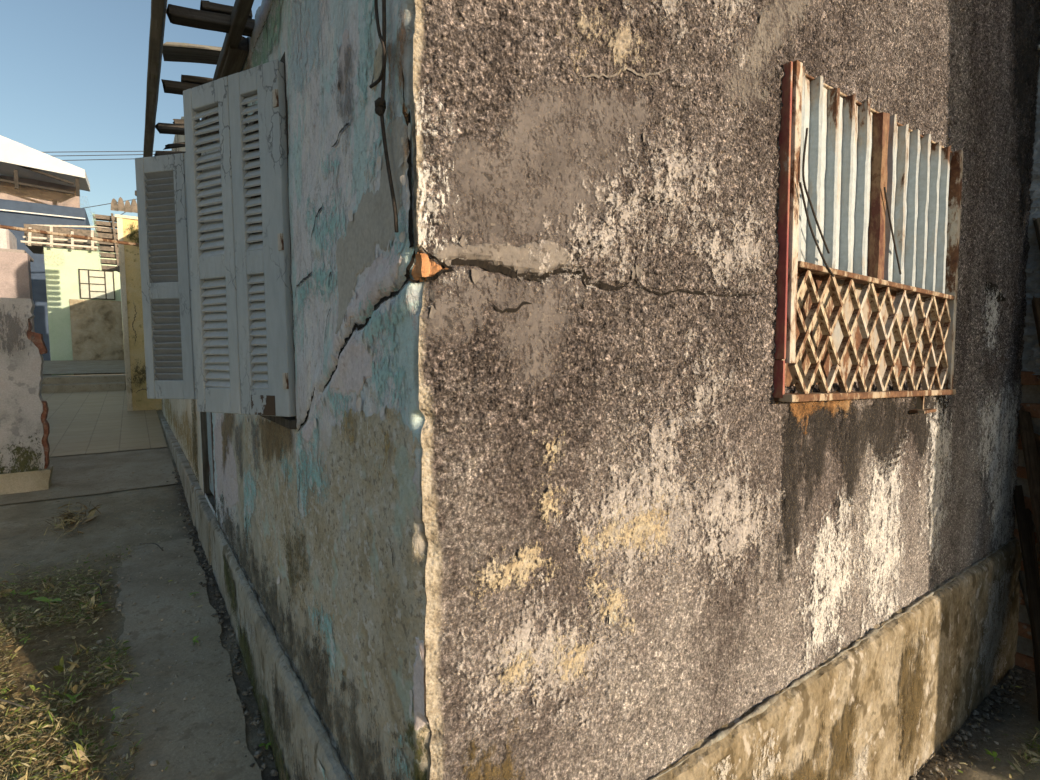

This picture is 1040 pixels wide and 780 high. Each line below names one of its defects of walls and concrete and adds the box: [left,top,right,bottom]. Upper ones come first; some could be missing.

peeling [337,0,387,109]
crack [398,70,414,248]
crack [441,196,763,313]
crack [295,272,410,431]
leakage [215,491,427,780]
flaking render [213,174,571,780]
leakage [437,329,957,780]
leakage [970,380,1022,552]